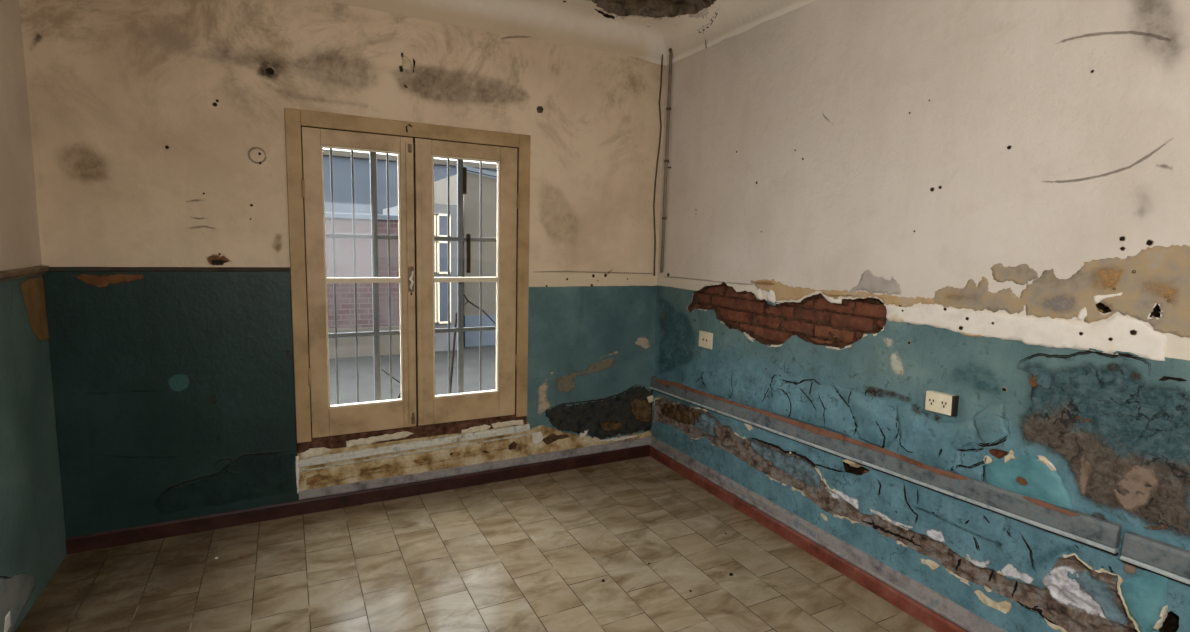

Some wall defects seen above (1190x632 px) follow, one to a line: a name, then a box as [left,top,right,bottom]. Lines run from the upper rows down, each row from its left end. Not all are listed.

spalling [586,0,717,20]
peeling [686,245,1190,350]
crack [696,370,1009,481]
spalling [300,396,1138,632]
crack [861,478,935,547]
peeling [0,573,36,632]